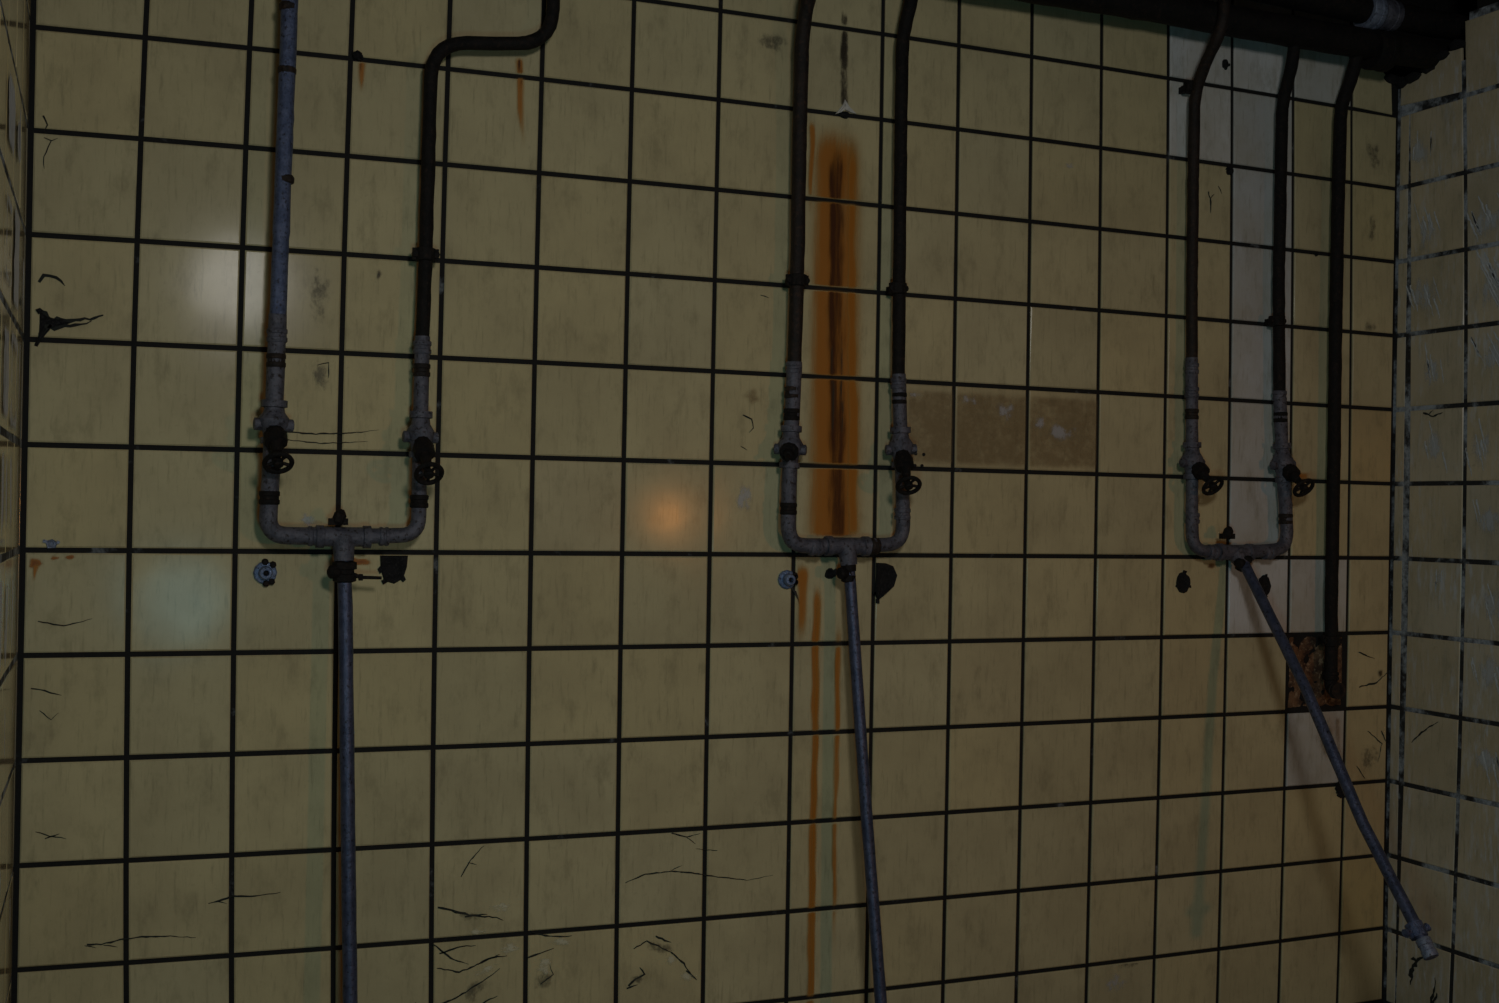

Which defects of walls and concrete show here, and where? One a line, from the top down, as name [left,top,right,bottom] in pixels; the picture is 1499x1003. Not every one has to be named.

corrosion [809,124,858,536]
corrosion [798,568,840,1003]